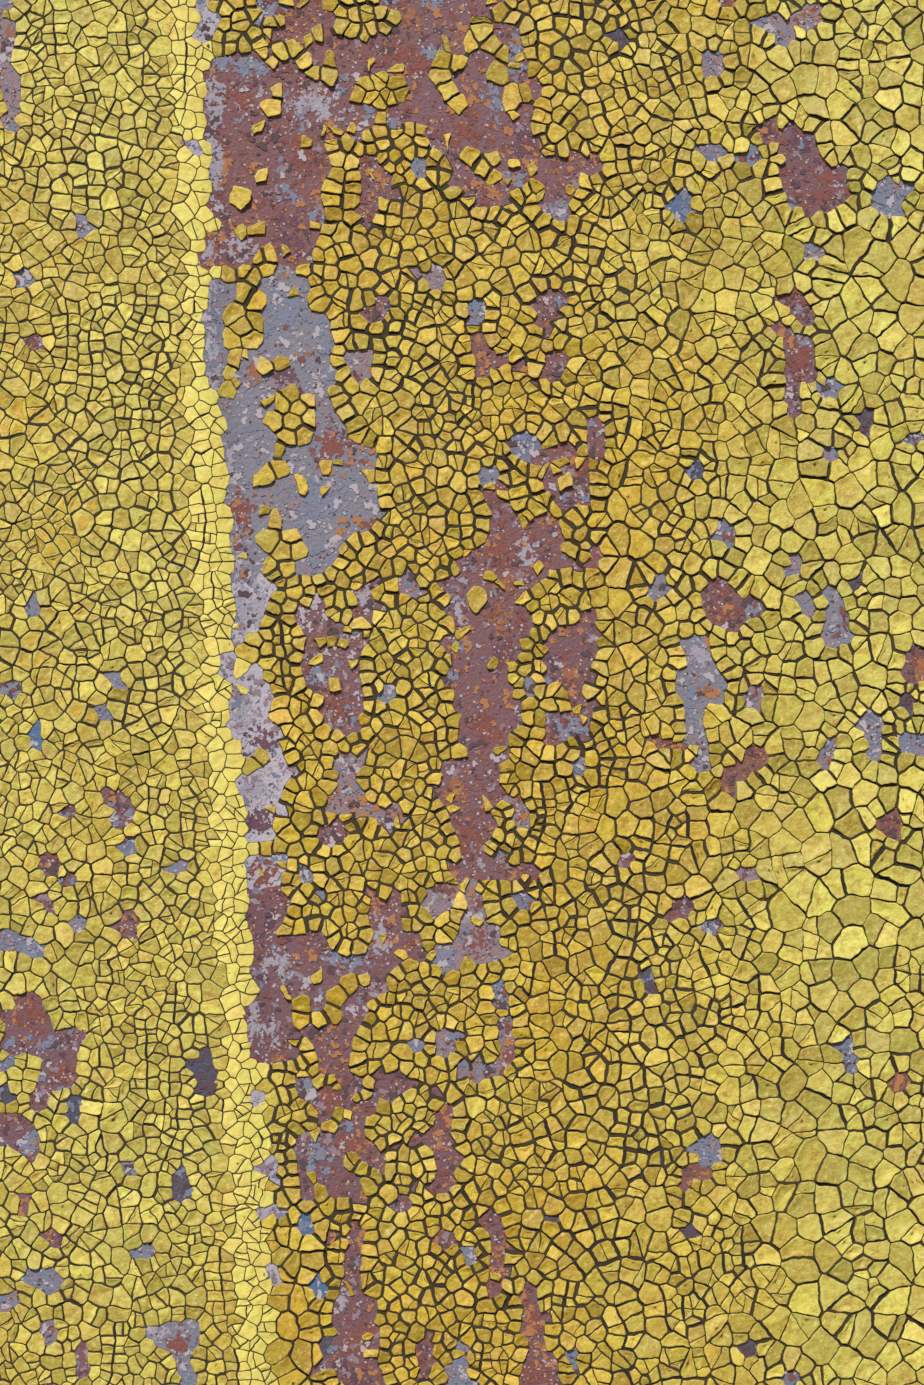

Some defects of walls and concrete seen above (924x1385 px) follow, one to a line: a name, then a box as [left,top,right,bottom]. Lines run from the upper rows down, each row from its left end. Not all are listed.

crack [321,0,394,43]
peeling [693,115,852,218]
crack [795,0,924,268]
crack [224,248,278,380]
corrosion [197,0,603,567]
crack [267,390,316,480]
corrosion [226,466,313,633]
peeling [185,0,655,1385]
corrosion [238,782,277,838]
corrosion [244,420,606,1200]
peeling [644,573,924,1010]
peeling [0,991,85,1159]